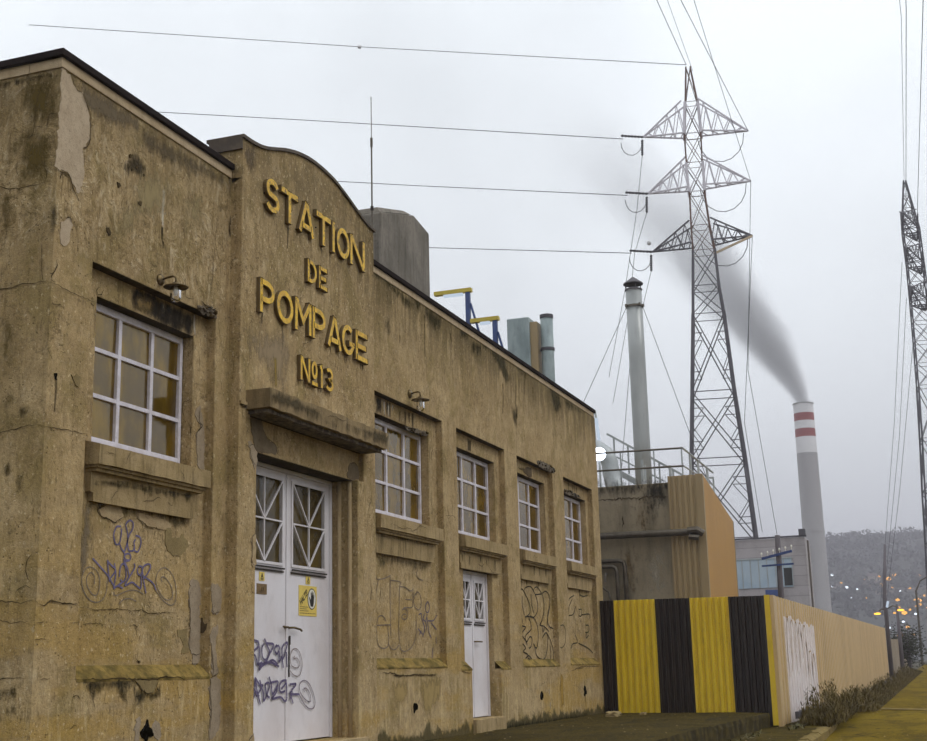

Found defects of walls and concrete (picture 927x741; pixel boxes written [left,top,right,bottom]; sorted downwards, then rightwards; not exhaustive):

flaking render [55,68,91,194]
damp [83,89,223,183]
flaking render [60,217,73,246]
flaking render [97,504,124,523]
flaking render [136,512,189,556]
crack [0,554,199,707]
flaking render [177,579,222,740]
damp [88,680,160,703]
flaking render [152,720,161,740]